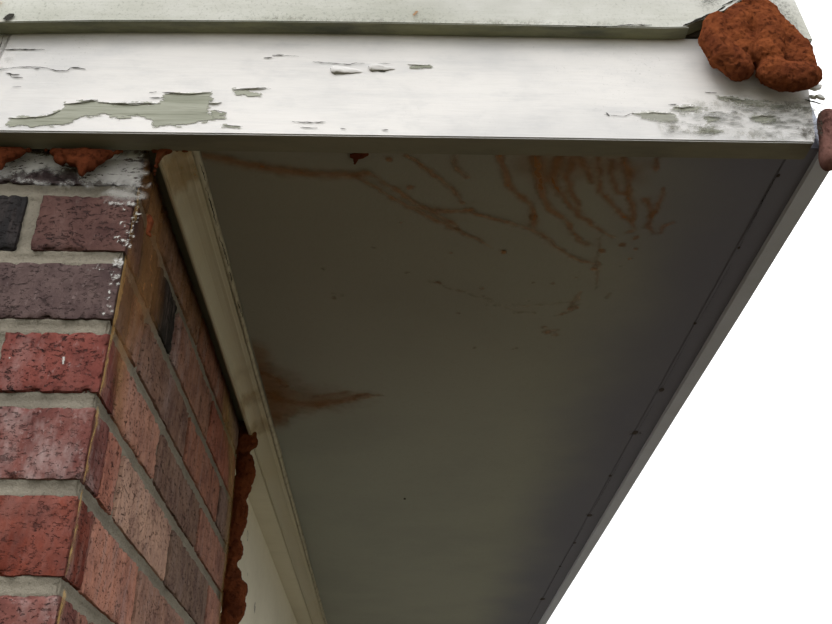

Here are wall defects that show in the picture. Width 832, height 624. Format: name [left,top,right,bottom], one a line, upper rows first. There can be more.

peeling [5,92,240,128]
peeling [232,87,271,97]
peeling [605,104,724,136]
peeling [706,92,784,123]